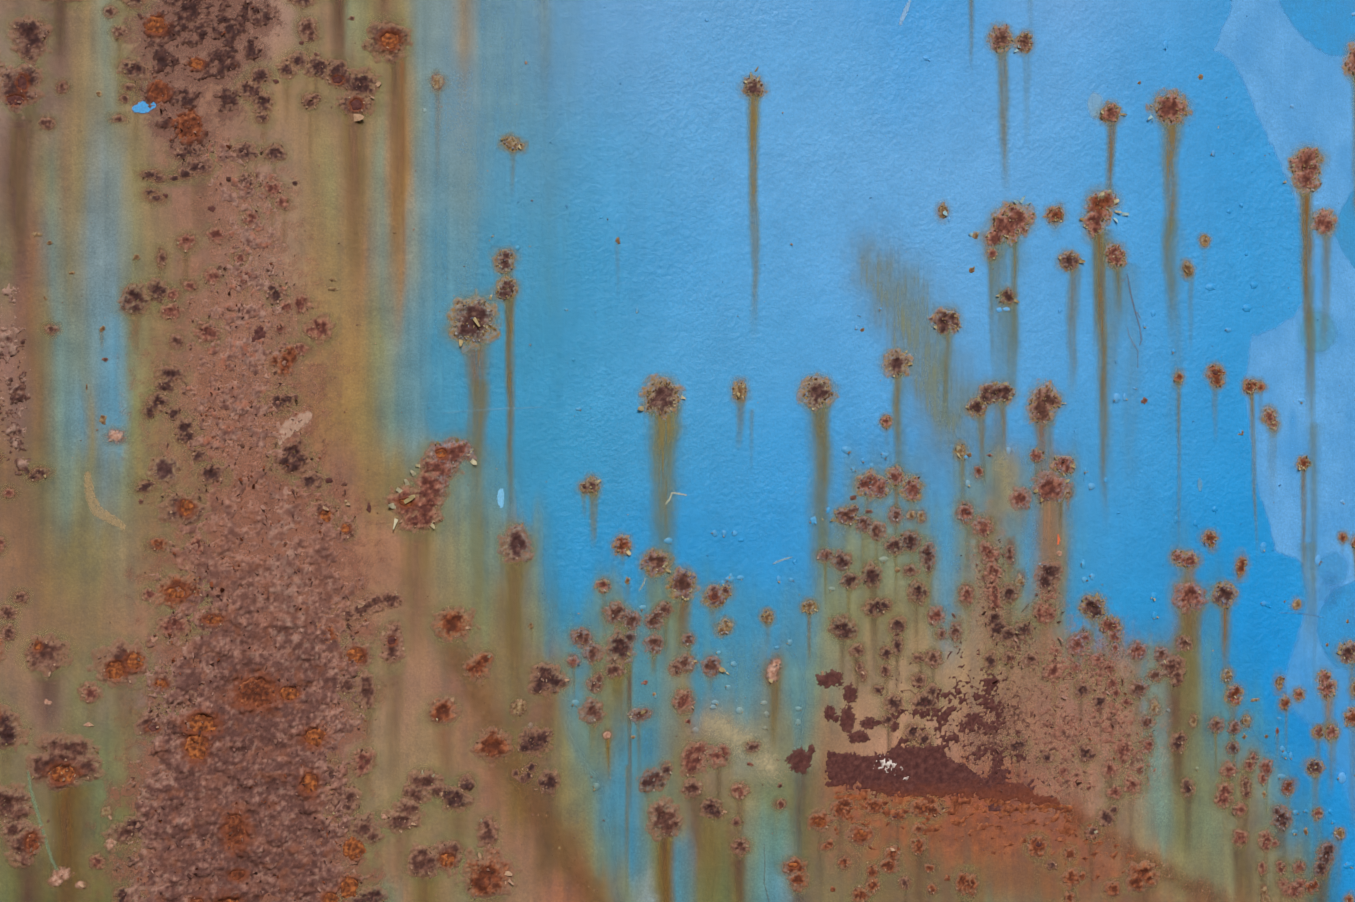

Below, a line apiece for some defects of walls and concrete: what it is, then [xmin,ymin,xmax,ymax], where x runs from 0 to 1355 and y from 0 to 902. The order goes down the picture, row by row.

corrosion [740,67,768,226]
corrosion [491,248,519,459]
corrosion [611,534,633,557]
corrosion [760,609,774,625]